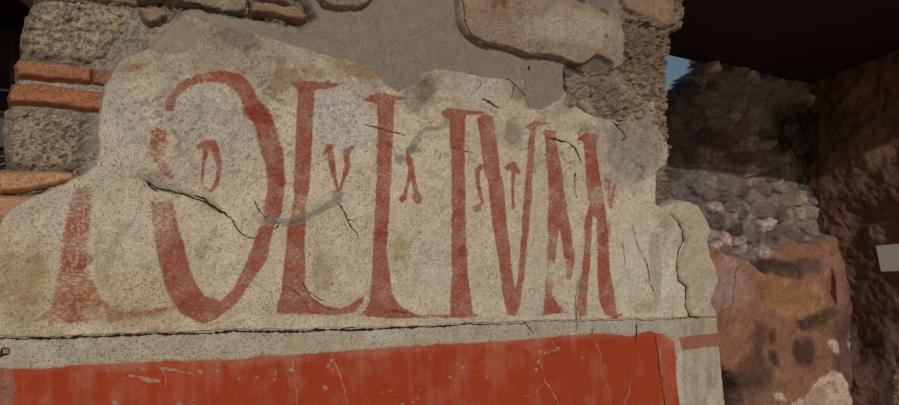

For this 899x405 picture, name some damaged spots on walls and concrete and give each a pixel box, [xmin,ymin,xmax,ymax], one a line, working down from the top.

spalling [563,55,614,76]
crack [144,179,253,238]
crack [0,221,737,405]